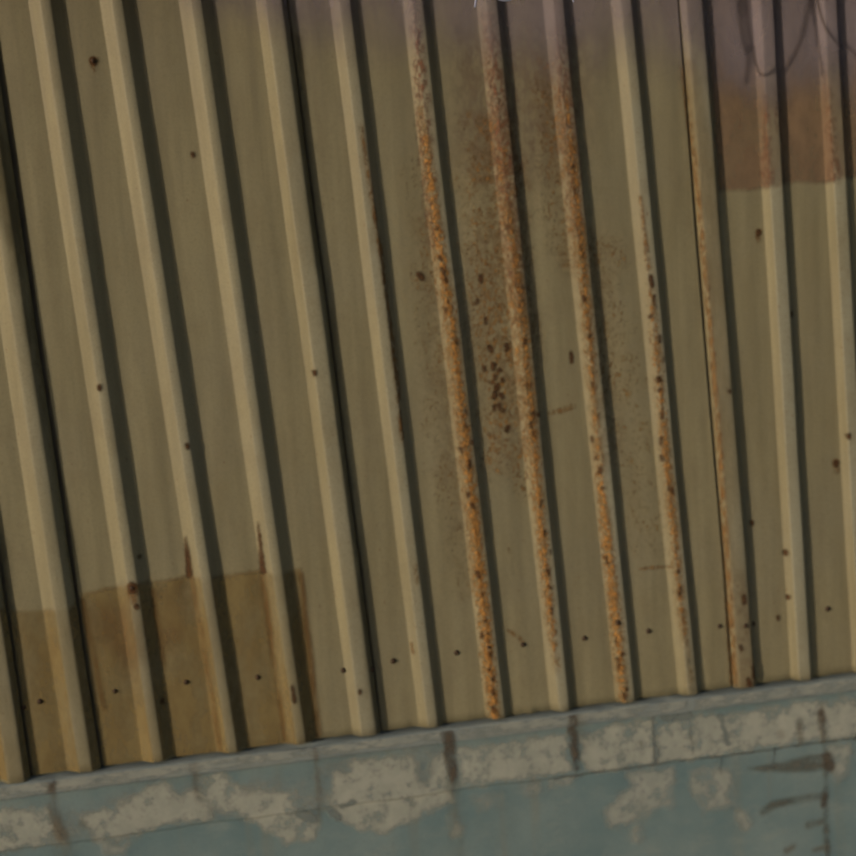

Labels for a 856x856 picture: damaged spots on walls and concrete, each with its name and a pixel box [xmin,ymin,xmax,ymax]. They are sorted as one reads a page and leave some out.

water stain [451,0,856,190]
rust [412,7,559,719]
rust [536,35,628,702]
rust [639,197,688,642]
rust [684,97,755,687]
water stain [0,610,79,788]
water stain [70,572,318,770]
peeling [0,679,856,854]
water stain [756,753,834,771]